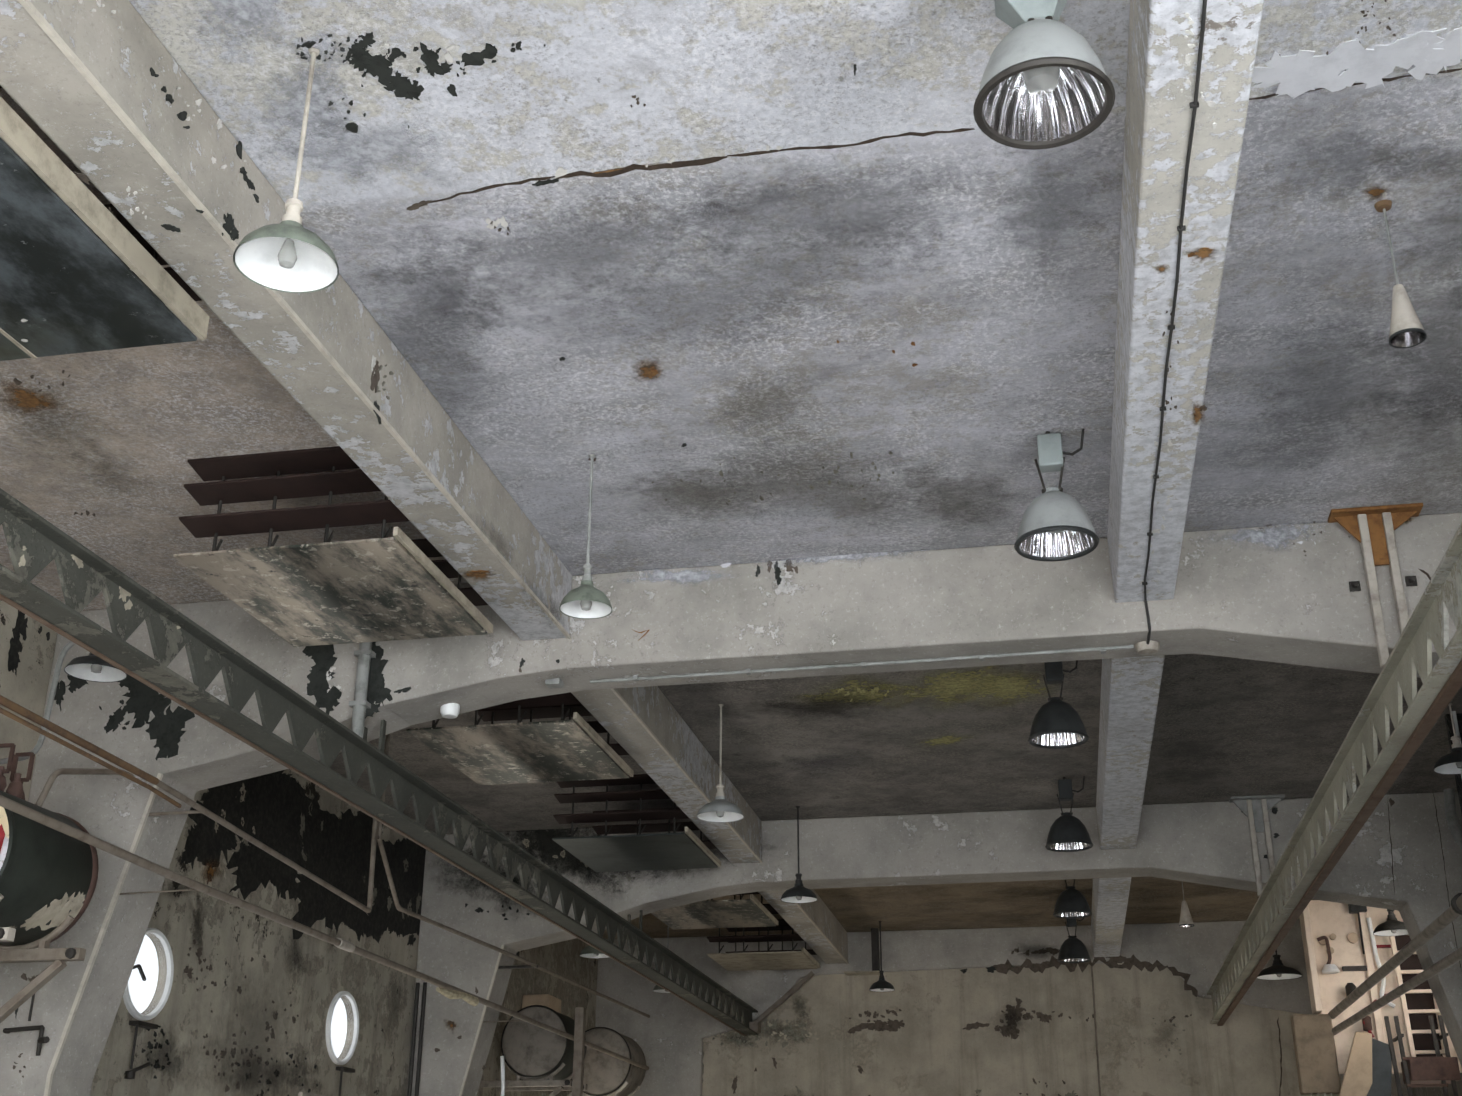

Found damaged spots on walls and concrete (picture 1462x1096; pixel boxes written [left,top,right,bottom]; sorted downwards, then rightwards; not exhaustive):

peeling [206,0,522,175]
peeling [1251,0,1462,99]
peeling [222,213,239,241]
crack [407,128,975,211]
corrosion [1366,187,1387,199]
corrosion [637,362,660,379]
peeling [54,675,88,711]
peeling [99,674,195,760]
peeling [302,644,342,715]
peeling [365,642,411,719]
water stain [803,665,1046,706]
peeling [181,770,426,946]